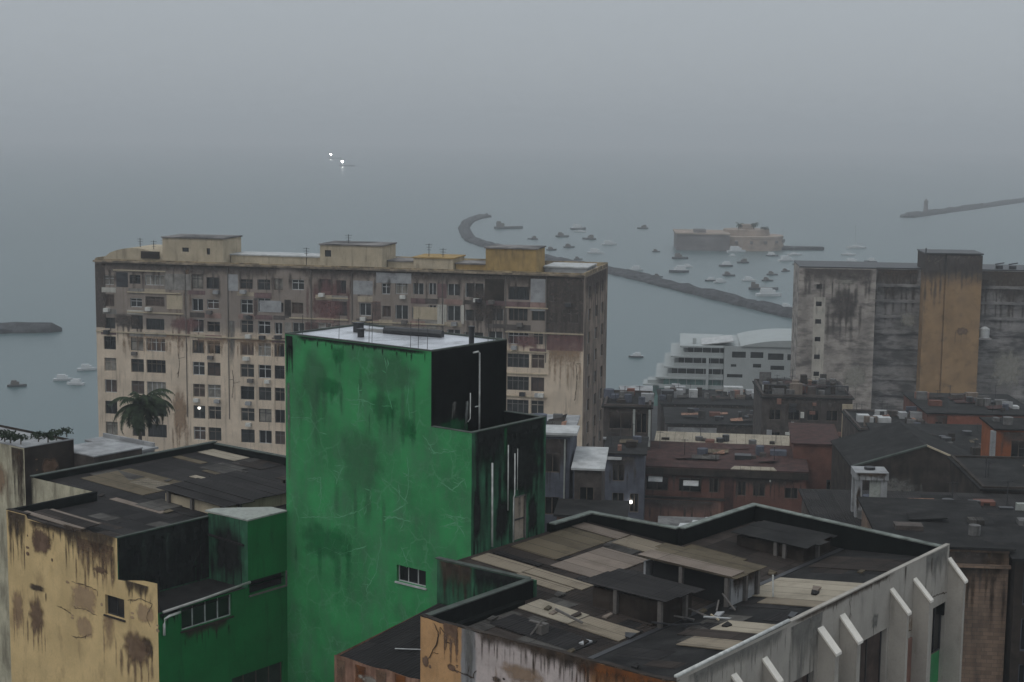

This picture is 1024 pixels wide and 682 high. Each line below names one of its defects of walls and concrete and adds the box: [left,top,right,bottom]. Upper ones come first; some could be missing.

water stain [805,255,1024,331]
water stain [0,447,242,596]
crack [300,358,470,592]
water stain [466,418,567,555]
water stain [13,584,46,644]
water stain [120,633,153,680]
water stain [443,622,670,682]